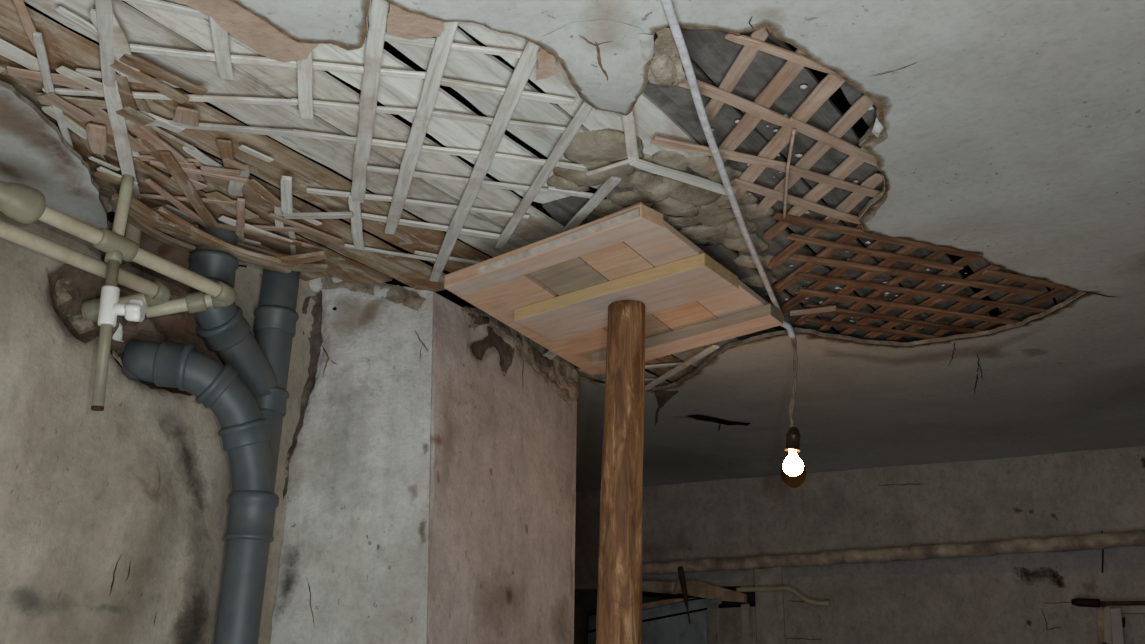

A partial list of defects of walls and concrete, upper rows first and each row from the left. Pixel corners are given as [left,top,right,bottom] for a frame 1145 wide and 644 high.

peeling [168,0,370,62]
spalling [385,0,1095,426]
spalling [140,231,191,270]
spalling [48,260,221,396]
crack [948,342,982,394]